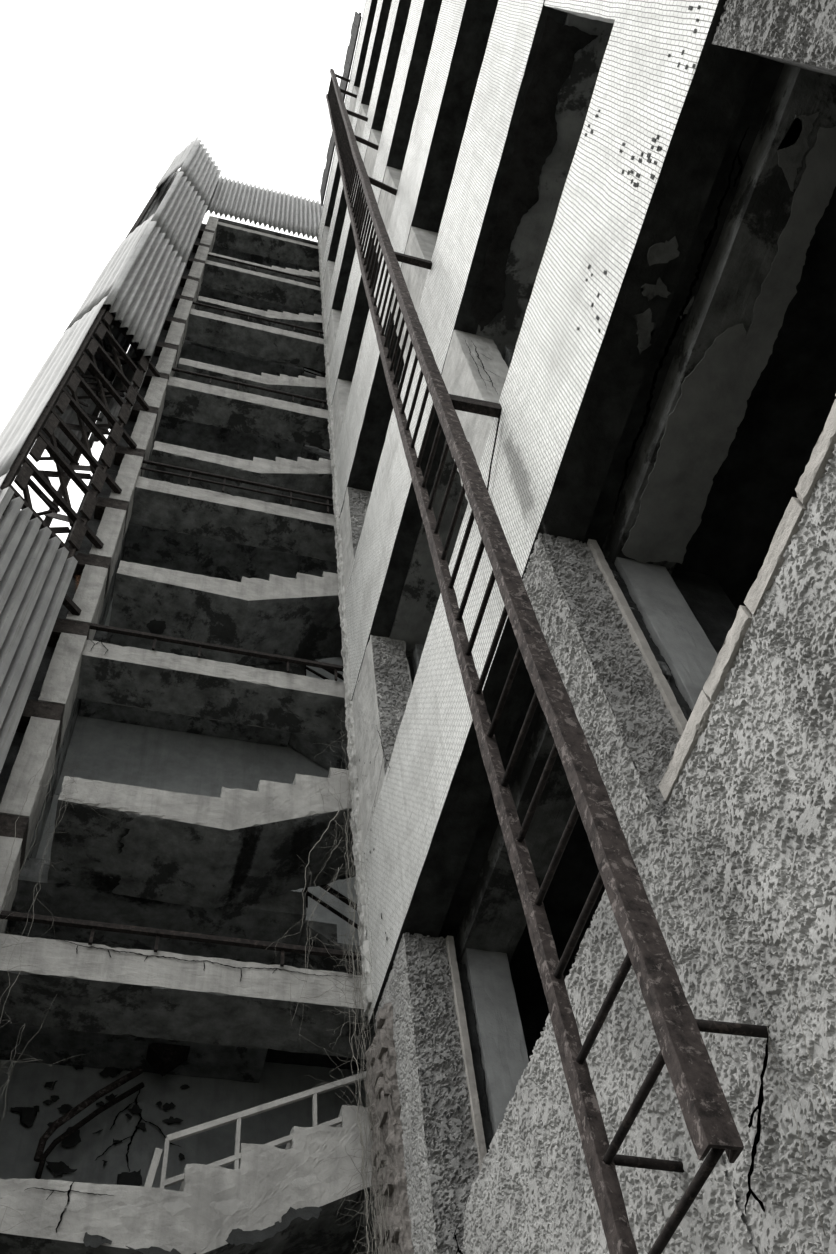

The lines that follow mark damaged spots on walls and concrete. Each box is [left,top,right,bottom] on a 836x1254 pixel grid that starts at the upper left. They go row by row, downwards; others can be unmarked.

flaking render [605,112,836,722]
leakage [82,867,178,906]
leakage [228,830,261,901]
leakage [287,818,315,882]
crack [25,1090,180,1233]
crack [745,1034,769,1214]